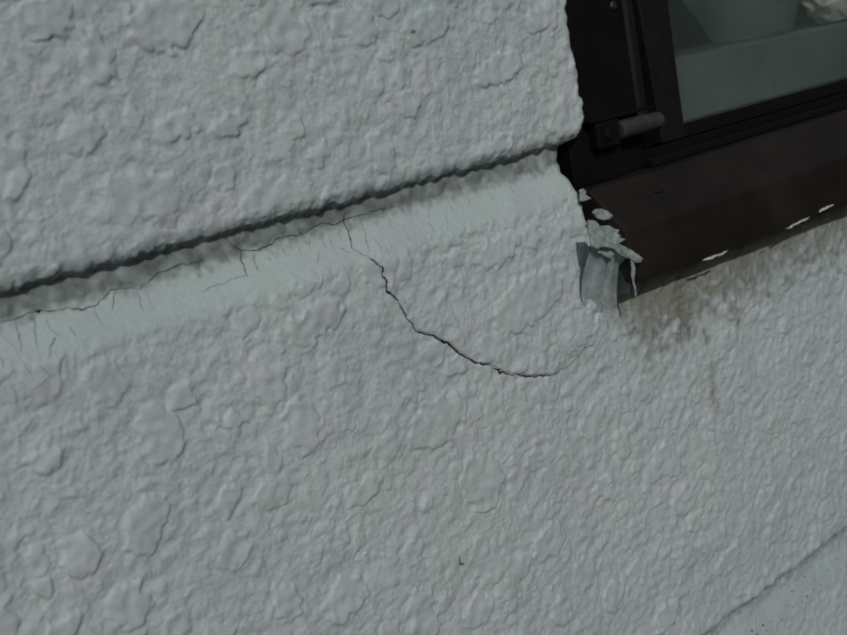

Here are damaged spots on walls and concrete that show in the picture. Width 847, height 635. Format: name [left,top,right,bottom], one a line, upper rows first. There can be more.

crack [0,261,199,390]
crack [205,195,608,378]
peeling [581,209,643,313]